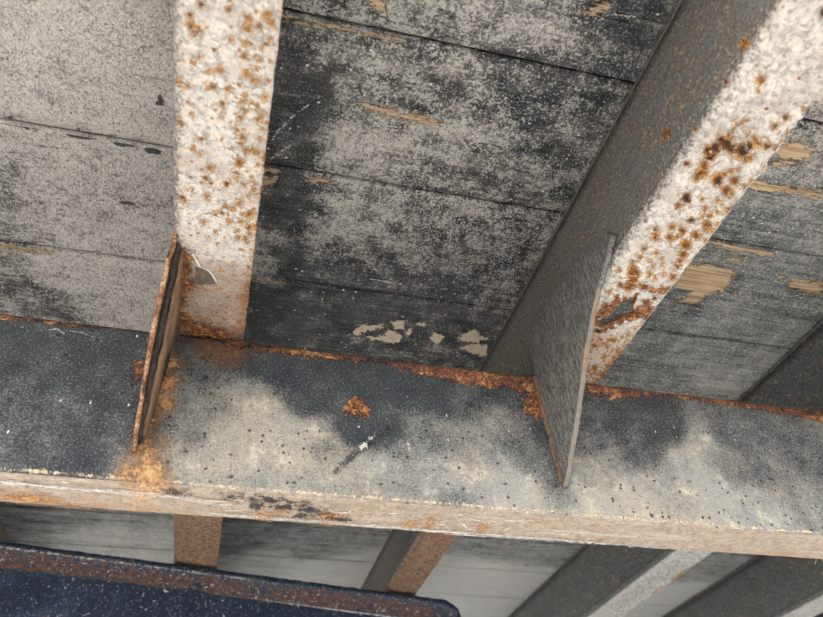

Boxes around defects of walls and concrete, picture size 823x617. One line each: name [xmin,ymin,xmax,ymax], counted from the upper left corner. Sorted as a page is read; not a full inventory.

peeling [365,0,391,15]
corrosion [176,0,279,251]
peeling [769,138,817,168]
peeling [748,177,823,200]
corrosion [591,113,792,374]
peeling [674,241,775,305]
corrosion [178,247,542,420]
peeling [351,320,445,344]
peeling [459,330,488,356]
corrosion [585,383,823,423]
corrosion [122,358,179,501]